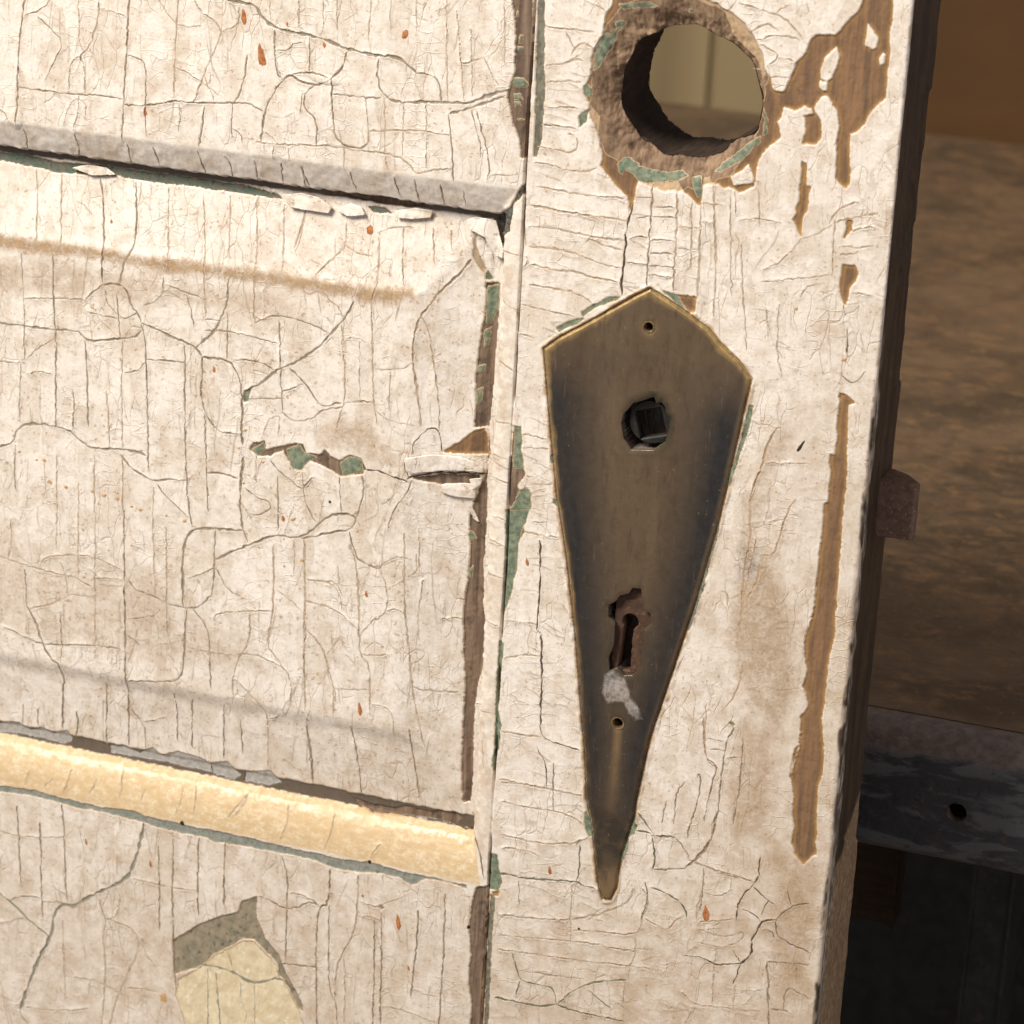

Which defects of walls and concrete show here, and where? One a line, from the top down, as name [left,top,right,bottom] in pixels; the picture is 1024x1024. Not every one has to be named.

peeling [0,152,433,219]
crack [499,106,877,383]
peeling [579,0,893,210]
peeling [793,162,811,236]
peeling [840,265,858,304]
peeling [251,441,366,476]
crack [0,0,810,1024]
peeling [355,183,531,823]
peeling [790,394,855,864]
peeling [0,786,502,1024]